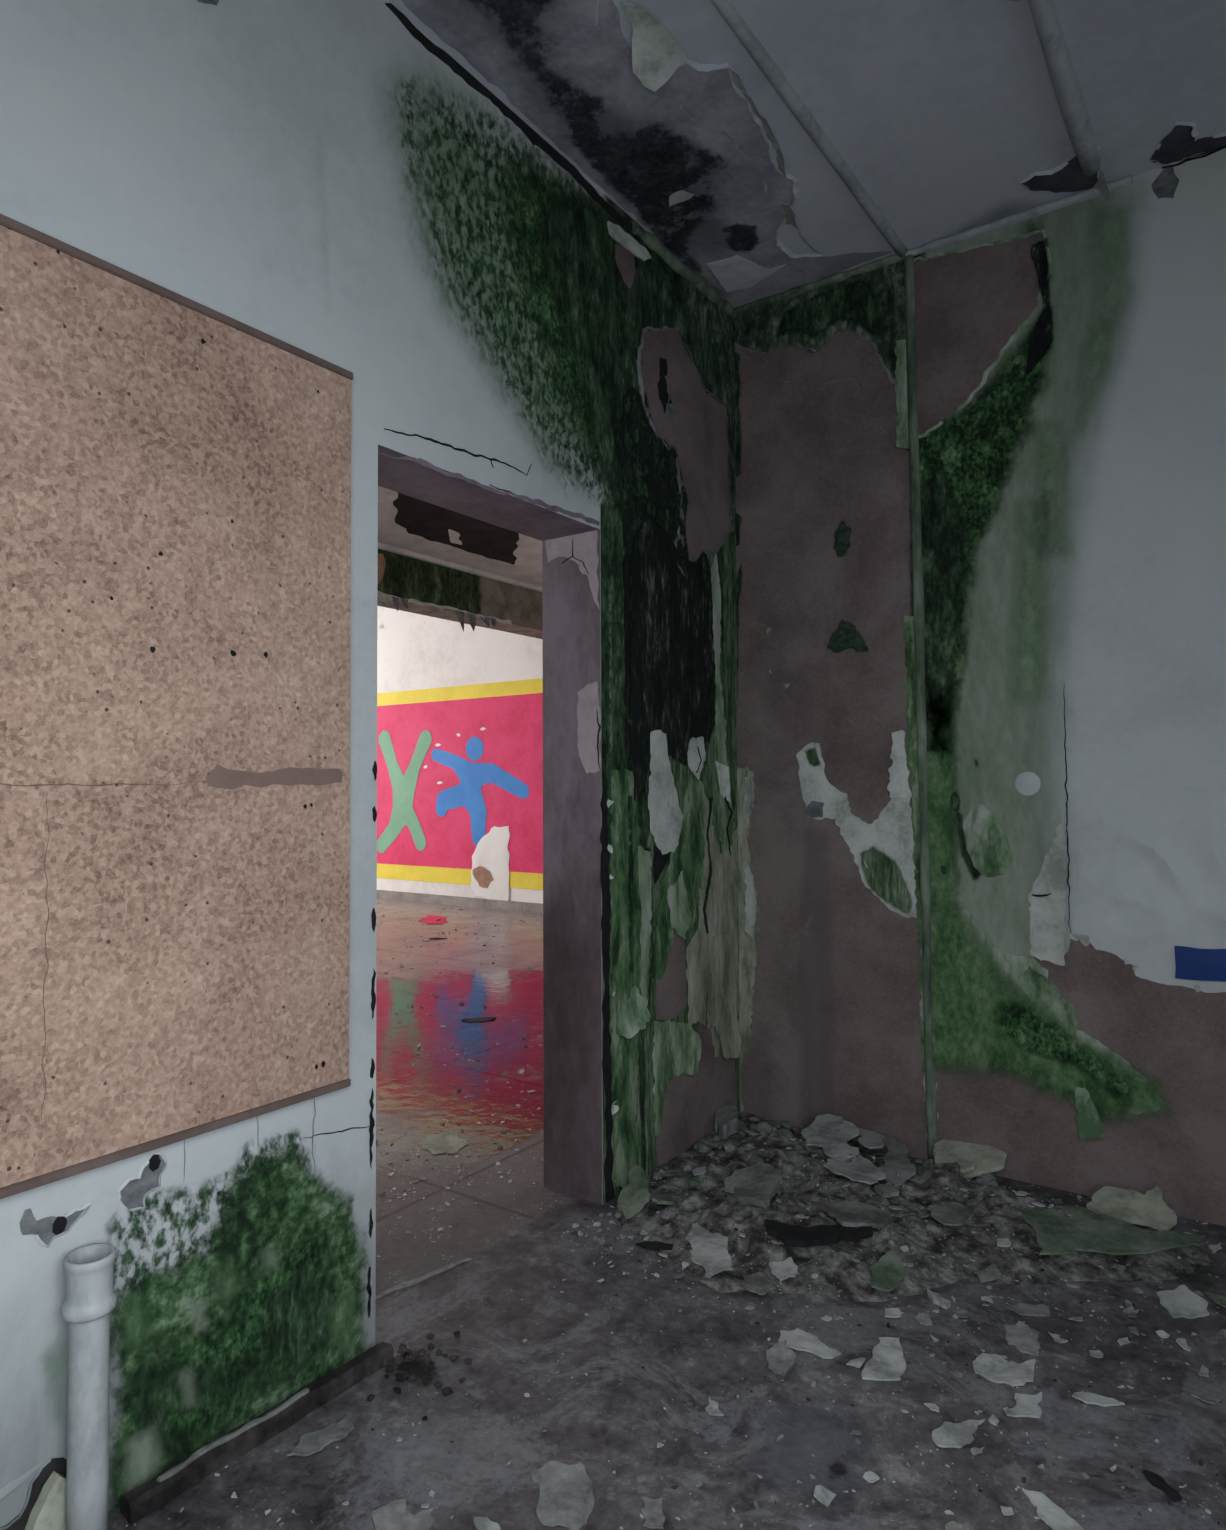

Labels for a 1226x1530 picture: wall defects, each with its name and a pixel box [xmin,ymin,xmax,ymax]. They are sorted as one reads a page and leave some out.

spalling [375,0,891,307]
spalling [1018,135,1110,201]
spalling [1149,121,1226,199]
crack [384,428,579,495]
leakage [469,0,1124,957]
spalling [577,229,1226,1270]
leakage [634,830,702,1176]
spalling [117,1152,168,1212]
spalling [20,1201,92,1248]